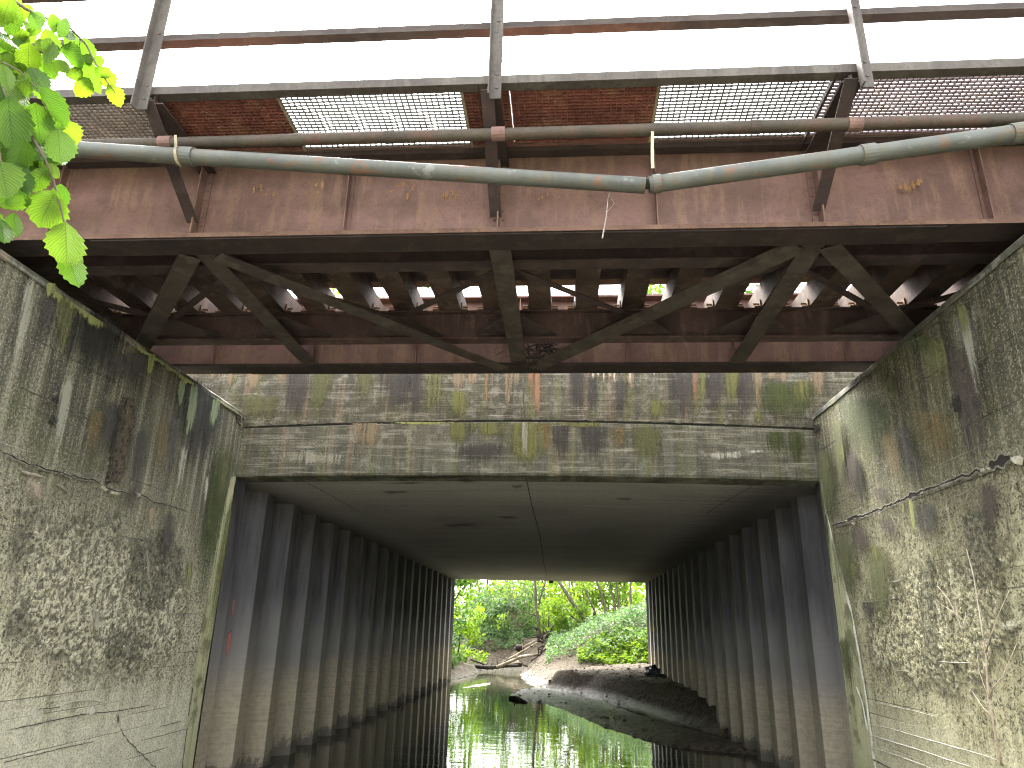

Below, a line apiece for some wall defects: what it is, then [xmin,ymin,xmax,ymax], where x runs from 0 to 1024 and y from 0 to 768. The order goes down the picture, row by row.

water stain [286,374,334,415]
water stain [357,374,568,462]
rust [452,374,488,401]
rust [505,373,541,411]
water stain [568,373,631,411]
water stain [910,304,987,462]
crack [2,452,184,511]
water stain [170,380,232,597]
water stain [817,376,897,626]
water stain [902,500,934,535]
crack [826,453,1024,527]
crack [4,688,193,768]